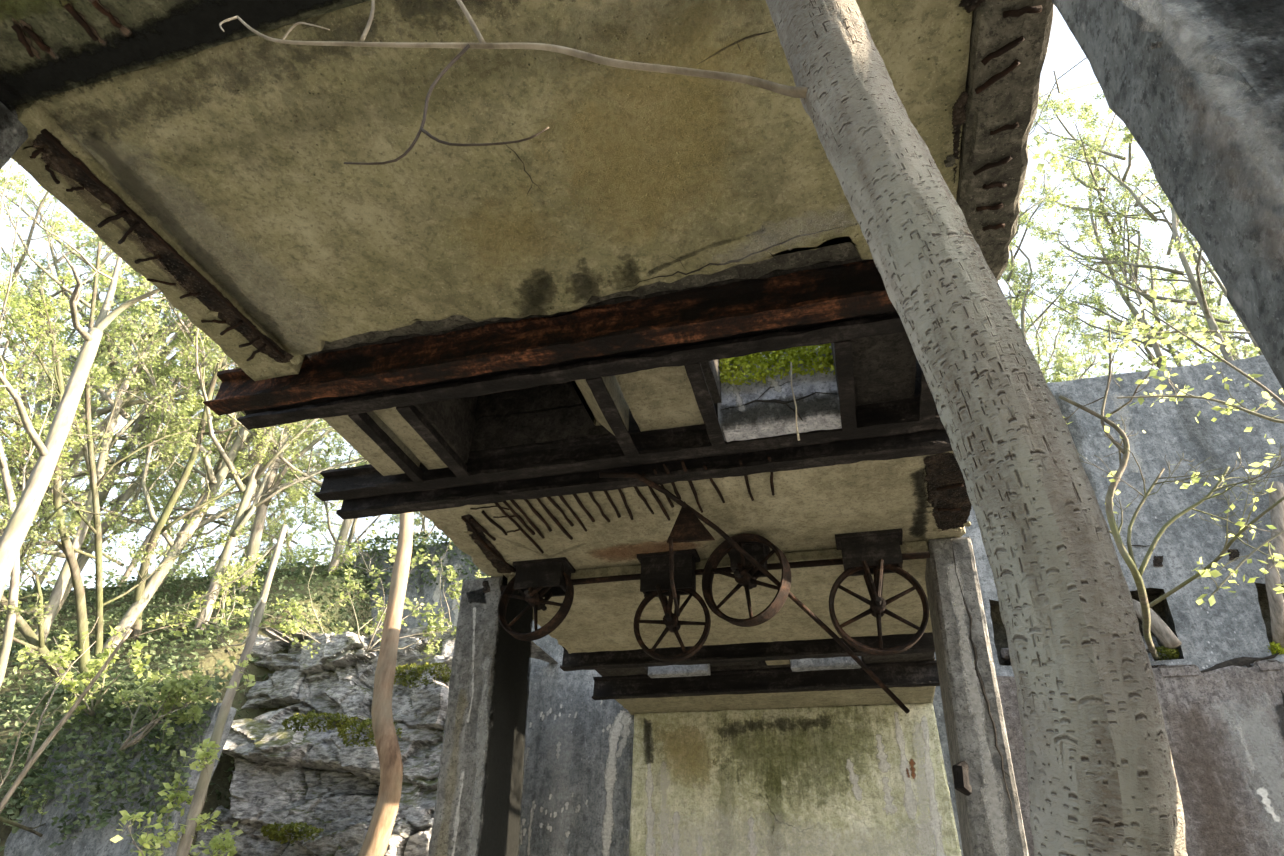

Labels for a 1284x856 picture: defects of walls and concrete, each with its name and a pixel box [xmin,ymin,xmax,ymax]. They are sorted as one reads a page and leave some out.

water stain [0,0,376,135]
spalling [958,0,985,13]
spalling [944,36,1025,183]
spalling [1003,5,1042,18]
spalling [22,129,303,365]
spalling [973,155,1013,231]
spalling [461,460,703,604]
spalling [703,465,725,503]
water stain [721,712,945,856]